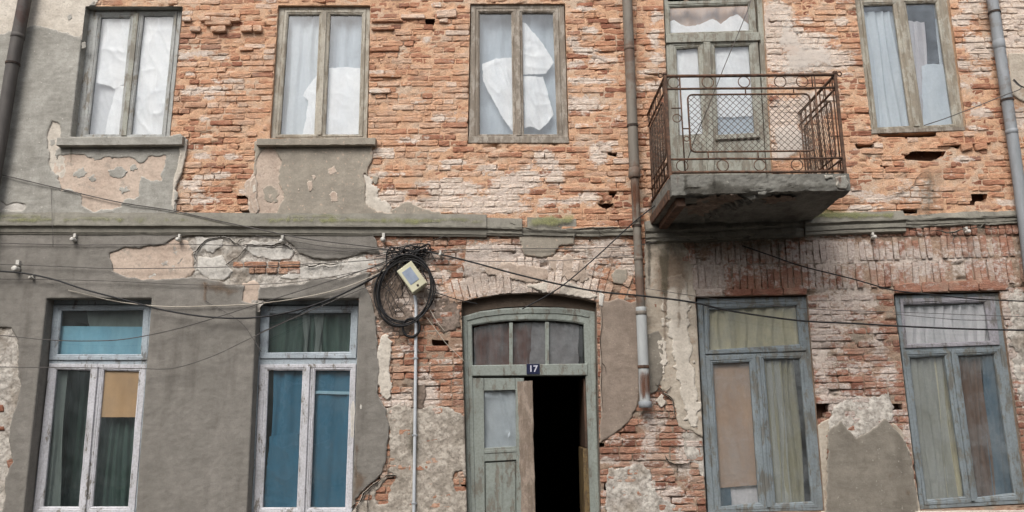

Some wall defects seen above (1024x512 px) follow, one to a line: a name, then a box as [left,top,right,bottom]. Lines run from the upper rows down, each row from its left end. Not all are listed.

flaking render [0,0,17,34]
flaking render [27,0,633,230]
flaking render [632,0,669,299]
flaking render [763,0,1024,215]
flaking render [0,327,21,512]
flaking render [110,224,1024,512]